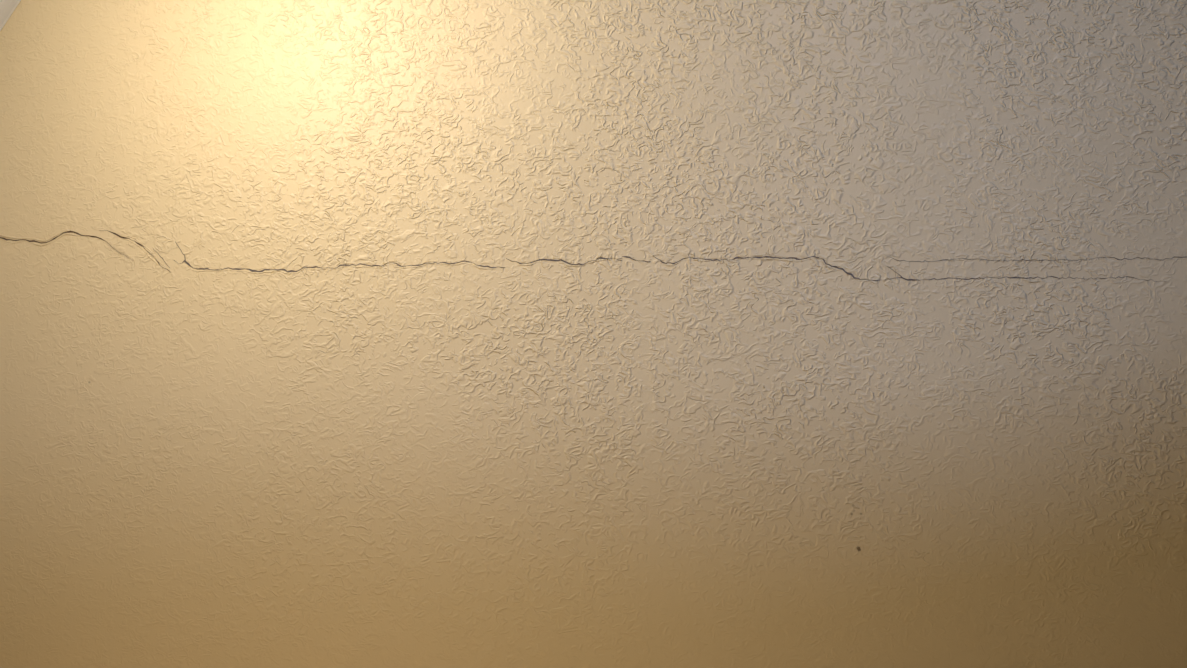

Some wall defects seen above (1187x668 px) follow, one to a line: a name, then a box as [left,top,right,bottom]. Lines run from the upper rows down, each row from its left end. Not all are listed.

crack [0,230,1185,282]